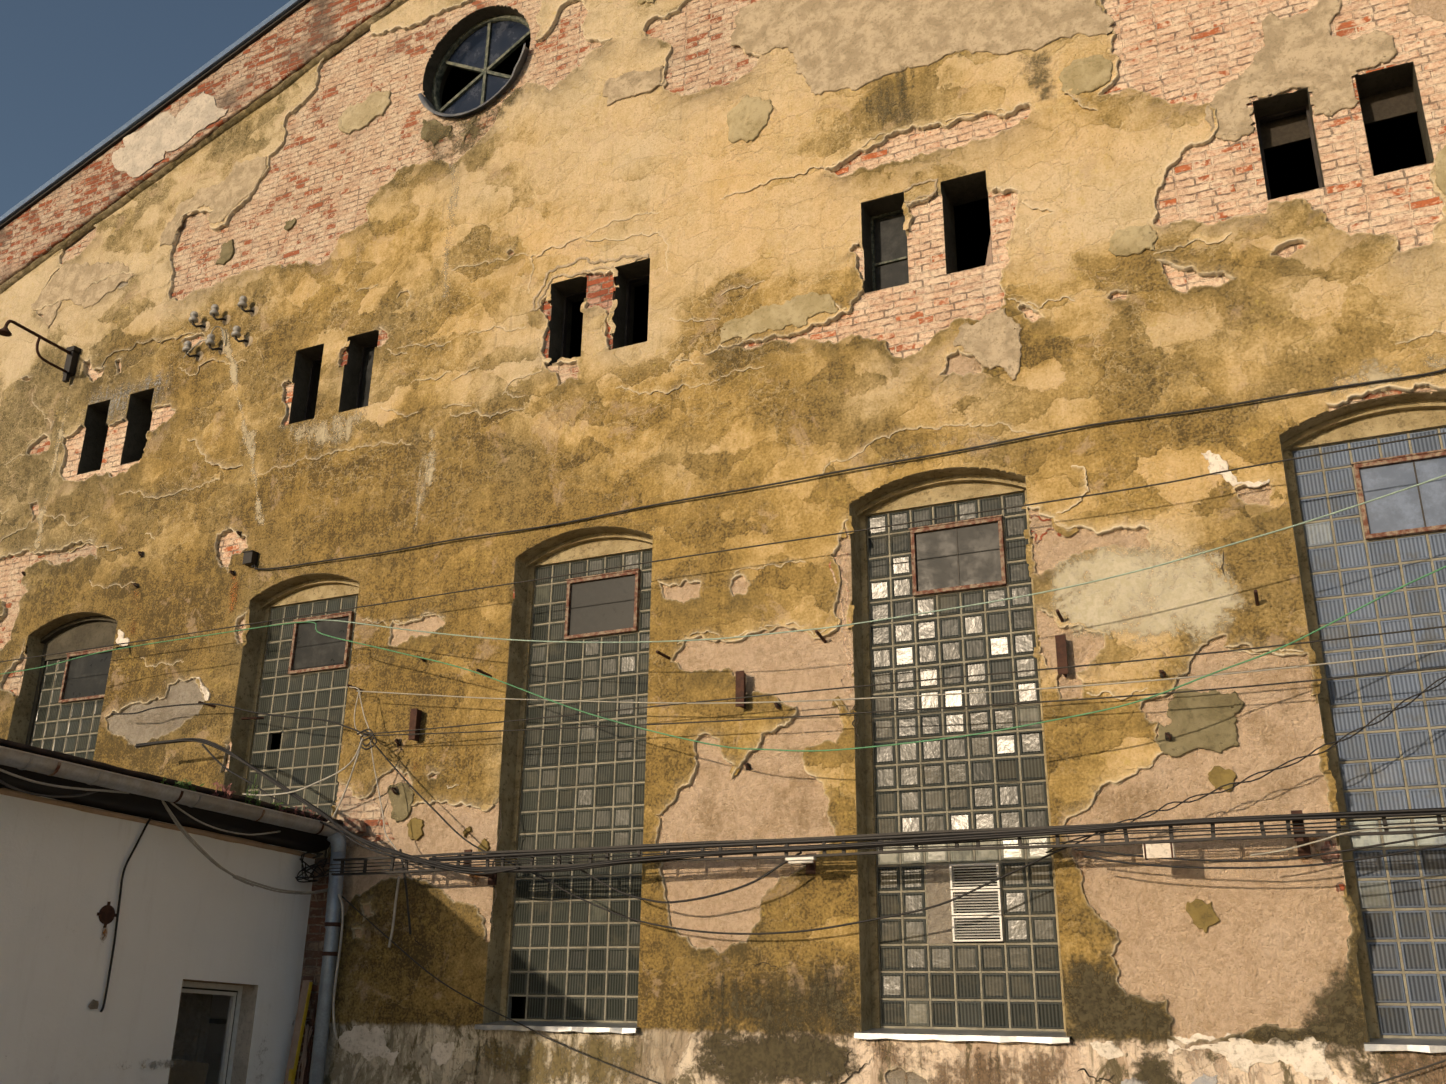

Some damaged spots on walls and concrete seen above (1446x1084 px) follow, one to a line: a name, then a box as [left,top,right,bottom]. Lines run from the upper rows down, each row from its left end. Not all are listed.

spalling [167,0,613,303]
spalling [1065,0,1446,297]
spalling [615,184,1075,395]
spalling [0,499,123,699]
peeling [116,629,130,646]
spalling [103,656,210,751]
spalling [653,516,856,958]
spalling [1033,606,1361,1084]
peeling [338,1025,399,1066]
peeling [430,1042,455,1066]
leakage [694,964,861,1084]
spalling [881,1064,932,1084]